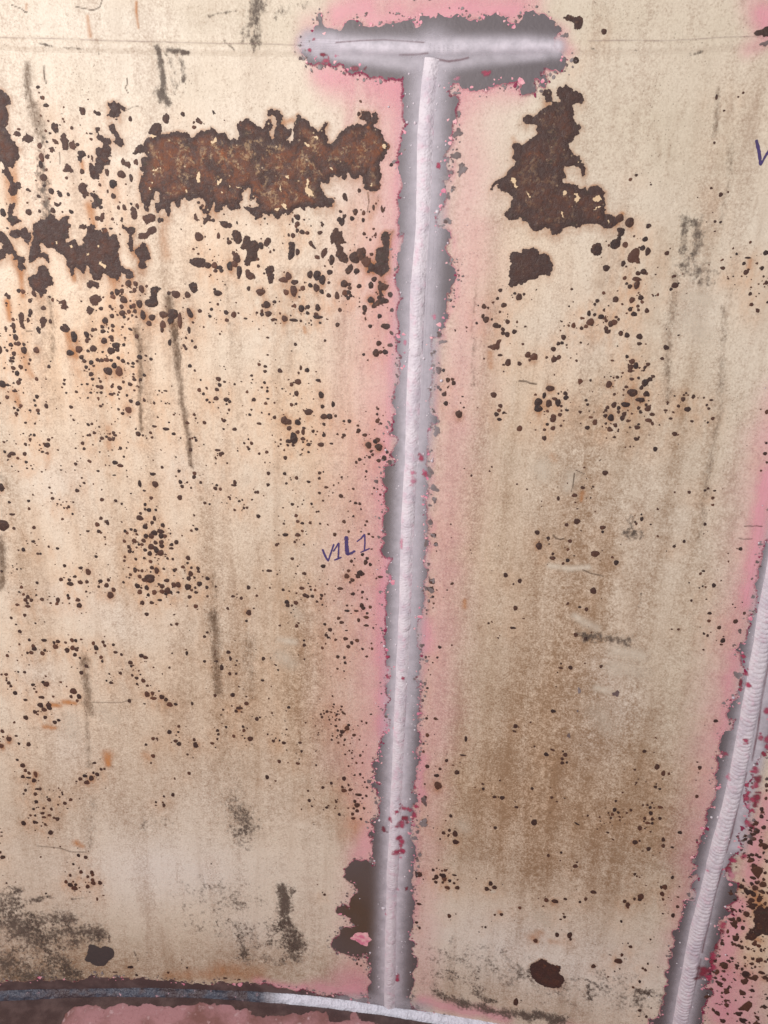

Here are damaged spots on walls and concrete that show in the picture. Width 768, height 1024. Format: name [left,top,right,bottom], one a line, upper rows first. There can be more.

corrosion [454,84,715,448]
corrosion [708,241,768,313]
corrosion [0,85,398,838]
corrosion [688,570,725,651]
corrosion [575,750,674,856]
corrosion [704,777,768,1024]
corrosion [85,945,145,978]
corrosion [529,959,565,988]